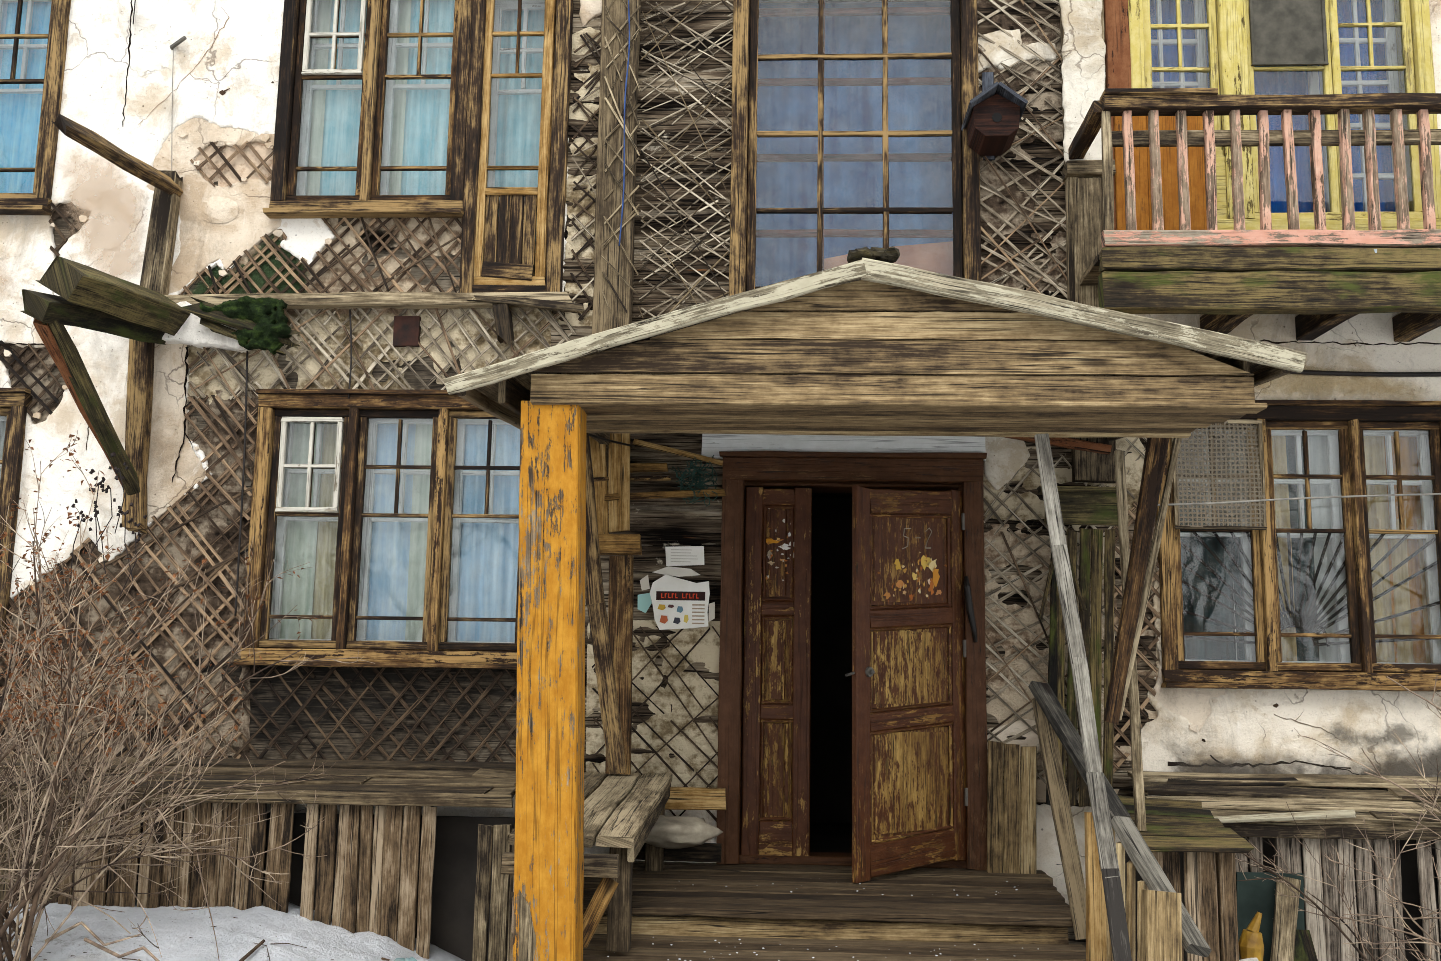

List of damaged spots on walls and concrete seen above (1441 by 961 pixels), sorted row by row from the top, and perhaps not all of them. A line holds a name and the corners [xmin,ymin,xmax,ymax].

crack [122,0,229,127]
peeling [147,118,283,294]
peeling [147,343,211,523]